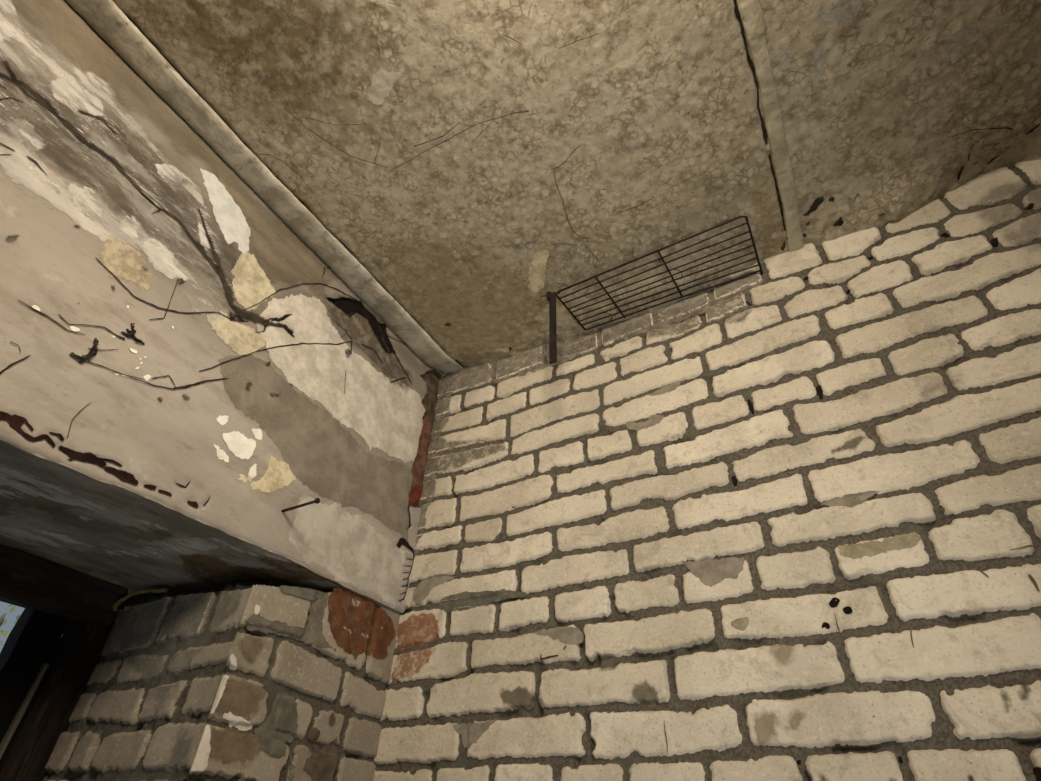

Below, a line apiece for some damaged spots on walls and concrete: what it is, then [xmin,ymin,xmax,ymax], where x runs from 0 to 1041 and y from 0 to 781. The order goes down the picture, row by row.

flaking render [0,0,442,542]
crack [0,7,465,394]
crack [285,109,529,171]
crack [734,0,786,231]
damp [0,464,288,562]
corrosion [180,554,439,684]